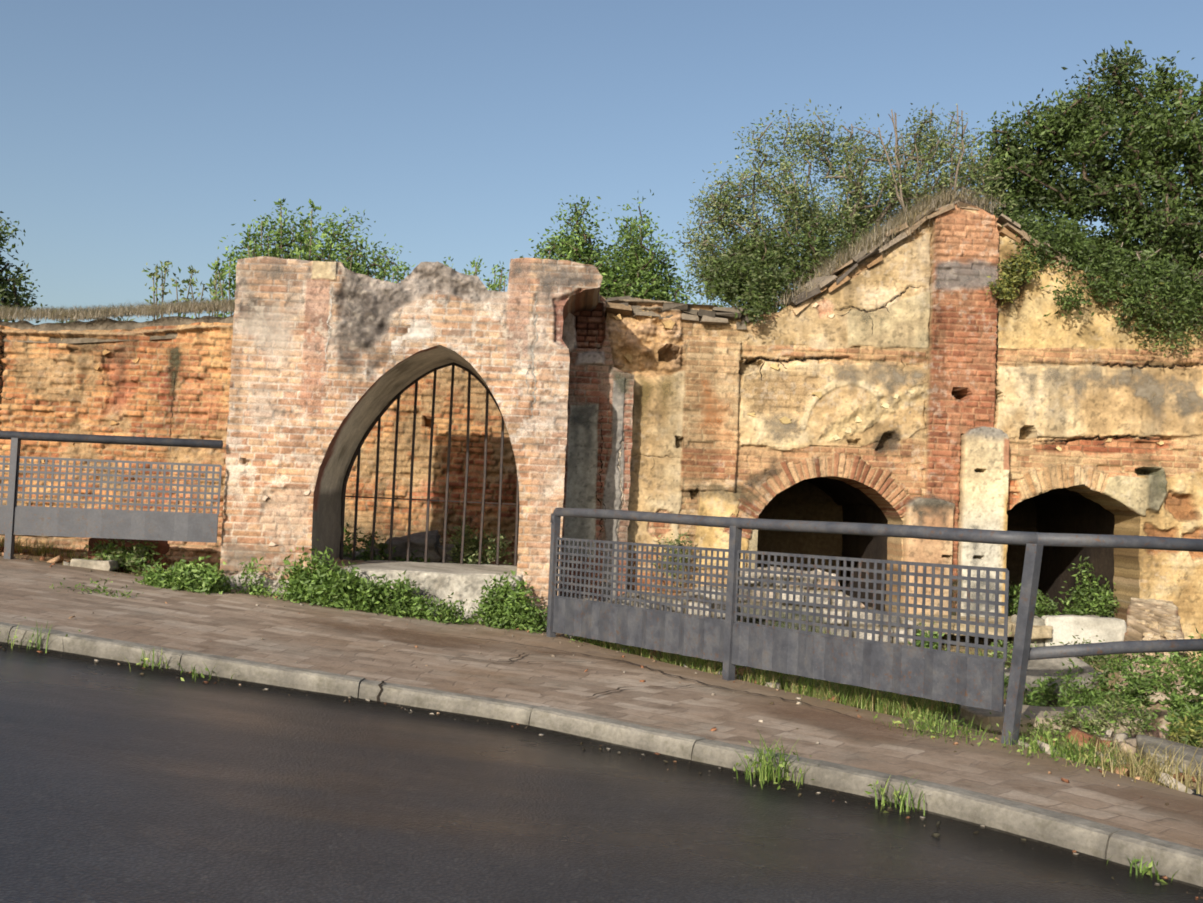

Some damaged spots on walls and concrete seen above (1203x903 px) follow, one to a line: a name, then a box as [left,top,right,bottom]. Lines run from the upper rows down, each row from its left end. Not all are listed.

crack [0,332,13,403]
leakage [391,319,434,351]
spalling [552,288,683,378]
crack [837,286,916,334]
spalling [1143,490,1203,561]
crack [377,680,388,702]